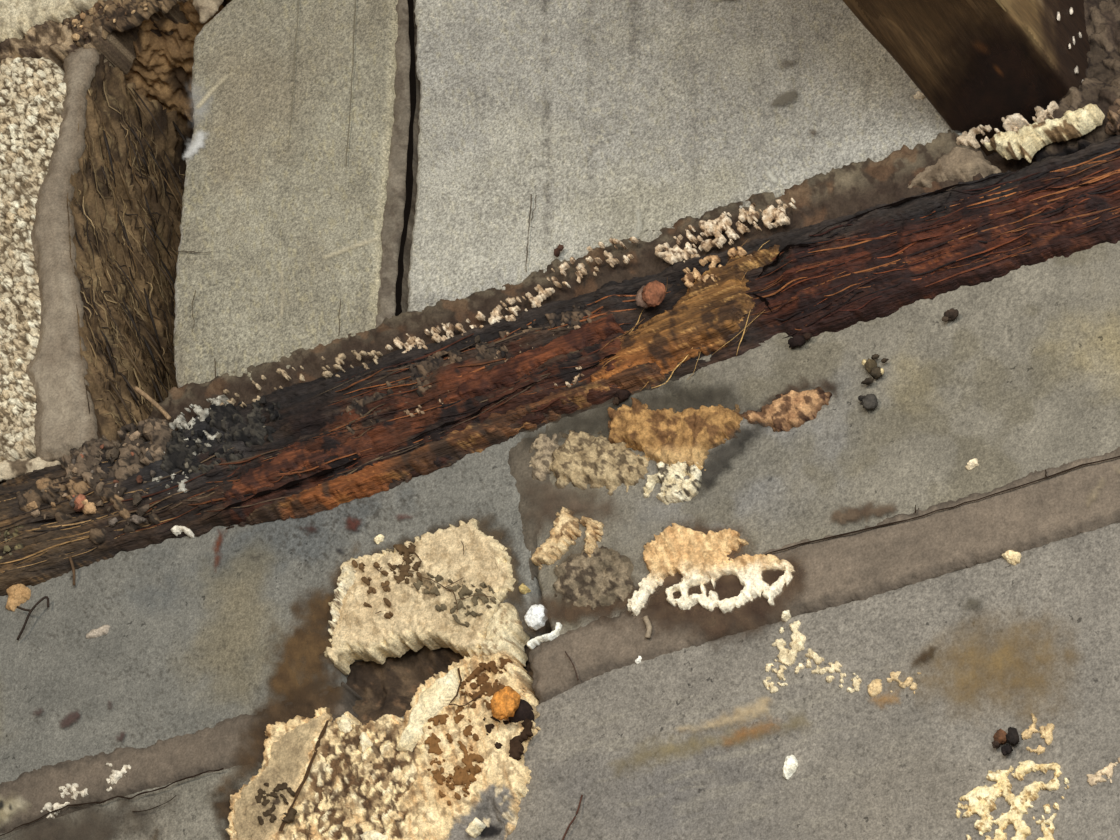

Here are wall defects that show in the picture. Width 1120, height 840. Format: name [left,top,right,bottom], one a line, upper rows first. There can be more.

damp [213,570,341,840]
spalling [225,518,562,840]
peeling [530,507,922,697]
peeling [782,755,798,780]